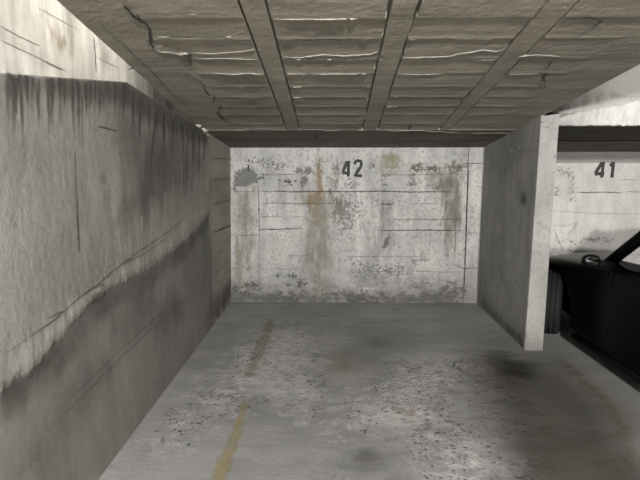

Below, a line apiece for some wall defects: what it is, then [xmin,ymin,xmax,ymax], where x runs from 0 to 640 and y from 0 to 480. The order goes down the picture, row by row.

crack [123,3,153,48]
leakage [6,73,207,174]
crack [178,58,268,124]
crack [73,183,81,252]
crack [6,219,183,353]
leakage [231,267,462,303]